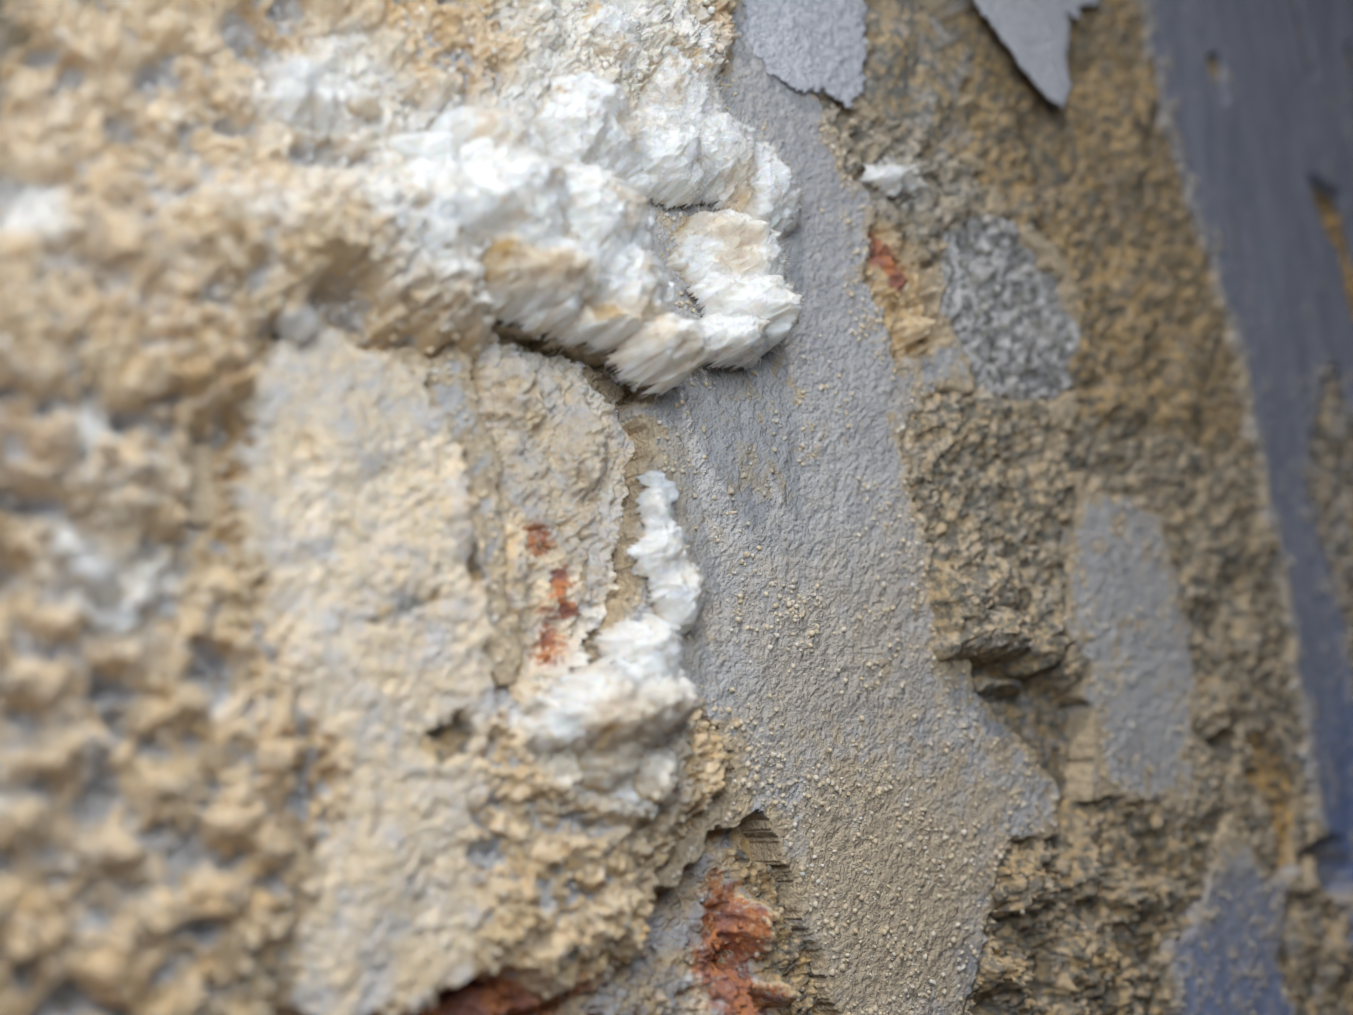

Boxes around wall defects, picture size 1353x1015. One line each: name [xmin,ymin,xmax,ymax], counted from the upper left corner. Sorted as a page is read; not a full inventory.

damp [250,0,810,405]
damp [517,460,719,817]
spalling [741,0,1319,1015]
peeling [1306,368,1353,675]
peeling [309,709,474,1015]
flaking render [415,820,802,1015]
spalling [1276,893,1353,1015]